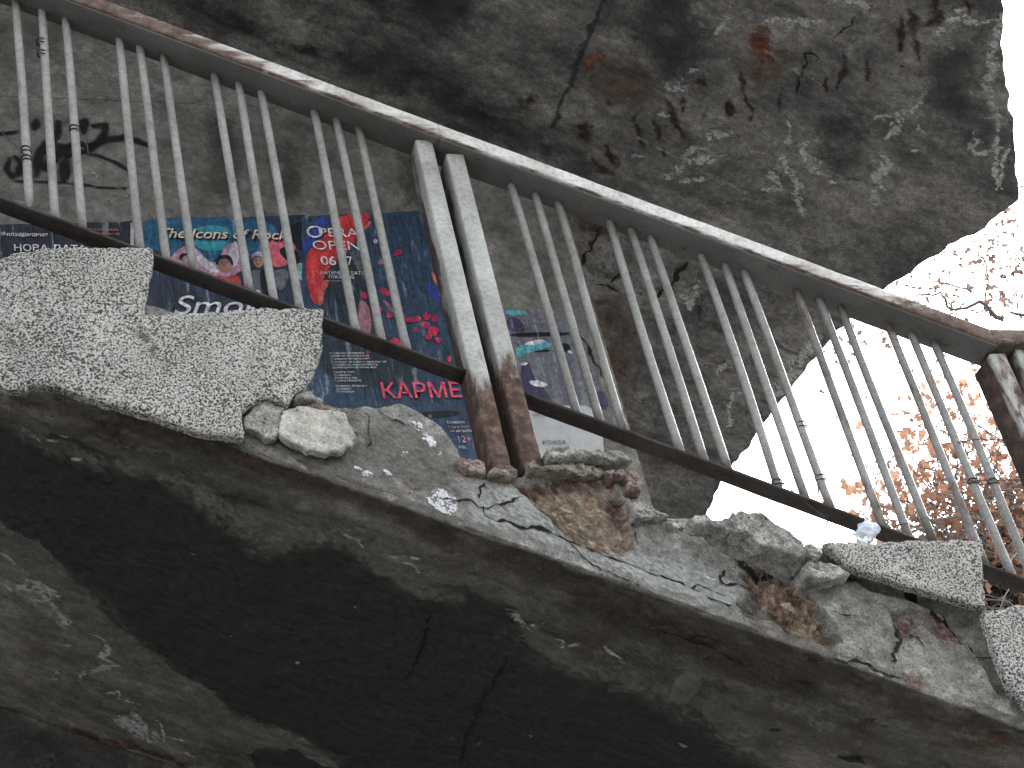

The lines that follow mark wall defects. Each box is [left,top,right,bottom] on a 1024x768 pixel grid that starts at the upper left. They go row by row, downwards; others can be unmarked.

water stain [761,15,826,29]
water stain [833,0,872,14]
crack [551,0,606,128]
peeling [426,488,457,515]
spalling [539,504,590,531]
rust [518,477,634,559]
crack [441,483,774,615]
water stain [0,422,777,768]
spalling [781,603,852,649]
crack [833,592,991,678]
water stain [670,657,961,765]
spalling [837,756,865,764]